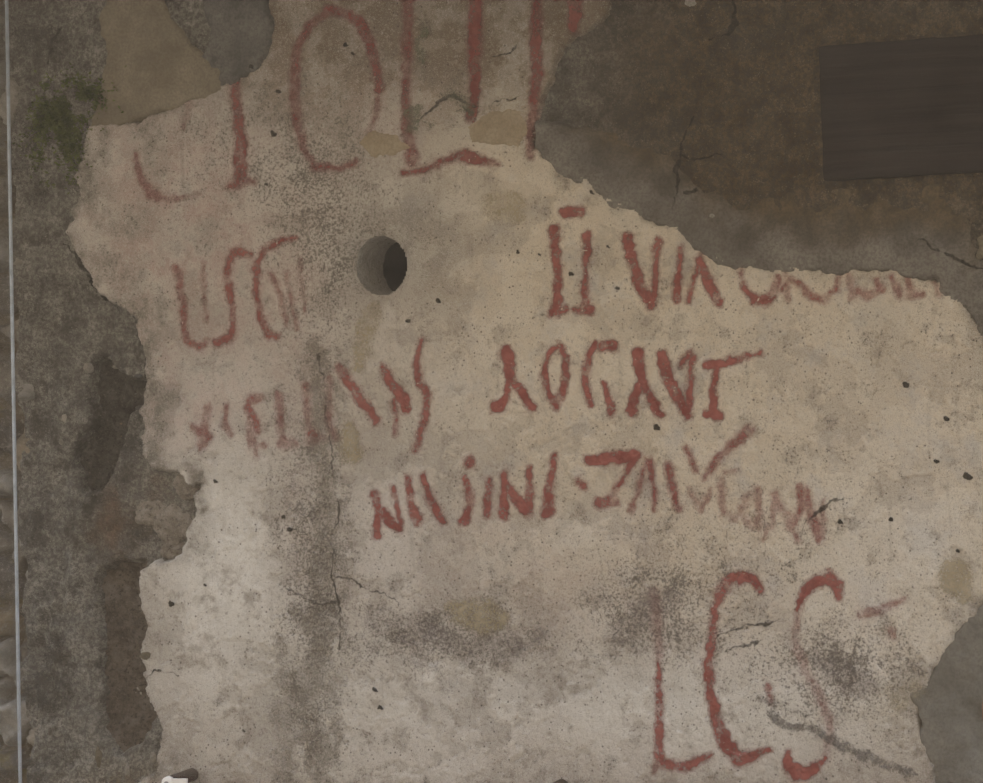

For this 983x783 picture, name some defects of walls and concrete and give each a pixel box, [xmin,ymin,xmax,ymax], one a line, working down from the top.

crack [673,116,721,194]
spalling [80,356,147,491]
crack [287,500,399,650]
spalling [102,561,157,783]